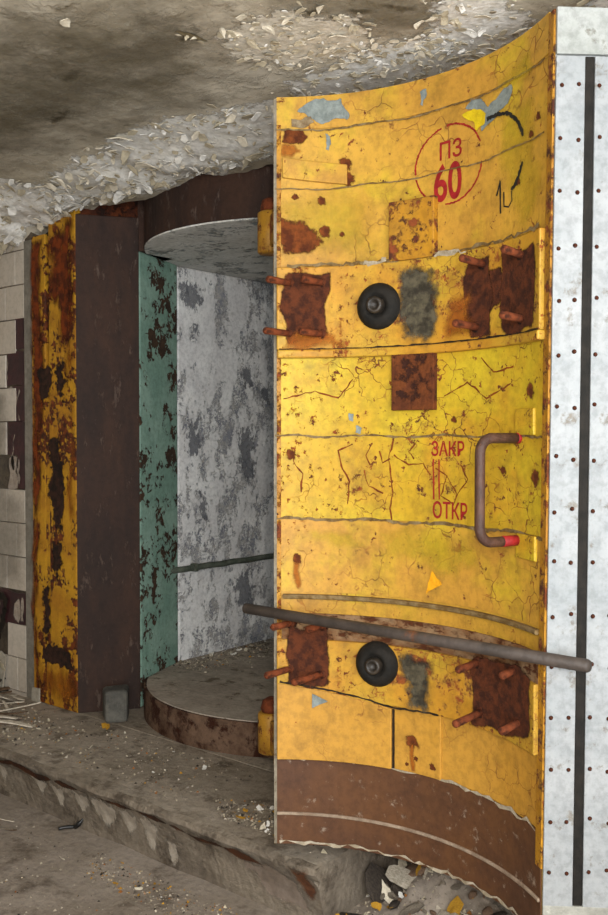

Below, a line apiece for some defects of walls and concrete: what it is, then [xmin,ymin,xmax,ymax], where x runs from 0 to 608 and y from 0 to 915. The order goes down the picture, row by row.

peeling [576,0,608,8]
damp [0,19,185,133]
peeling [175,0,537,150]
peeling [0,92,277,259]
corrosion [281,218,344,254]
corrosion [280,272,341,349]
corrosion [446,242,536,338]
peeling [6,318,25,490]
peeling [37,361,67,402]
corrosion [30,218,73,688]
corrosion [285,627,330,689]
corrosion [469,657,530,739]